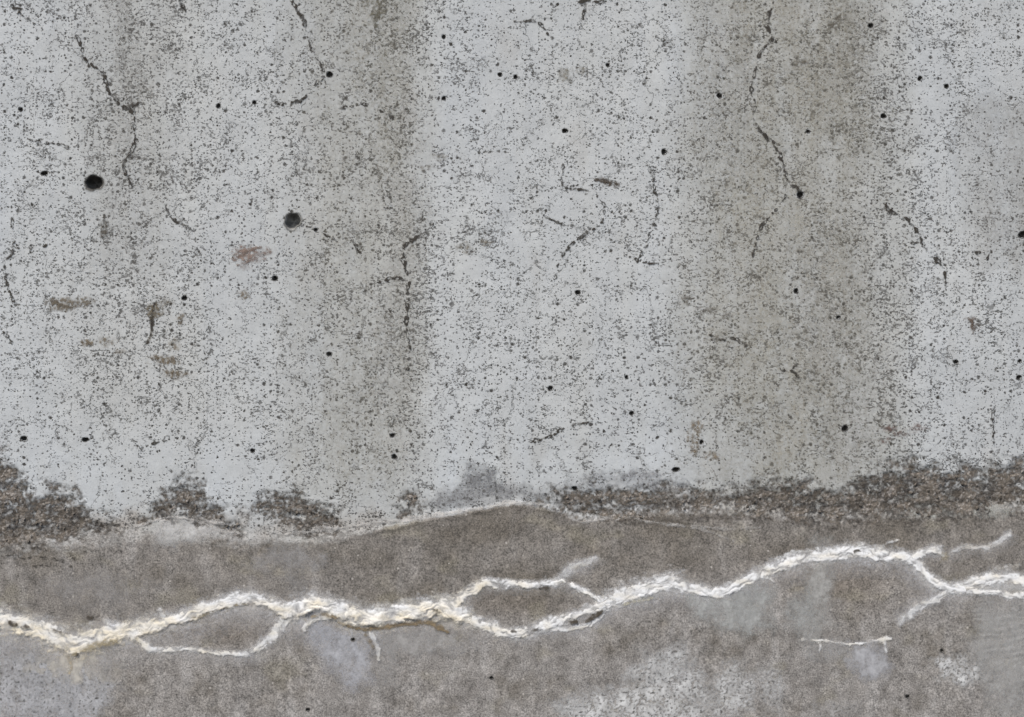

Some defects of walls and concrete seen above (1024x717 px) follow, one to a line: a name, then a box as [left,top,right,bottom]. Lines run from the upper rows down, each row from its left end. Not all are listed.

crack [68,34,140,201]
crack [749,1,800,257]
crack [379,223,434,371]
spalling [0,450,113,553]
spalling [136,475,341,538]
spalling [397,490,426,522]
spalling [536,456,1024,530]
crack [0,533,1024,679]
water stain [689,585,772,633]
water stain [786,560,832,641]
water stain [309,620,456,685]